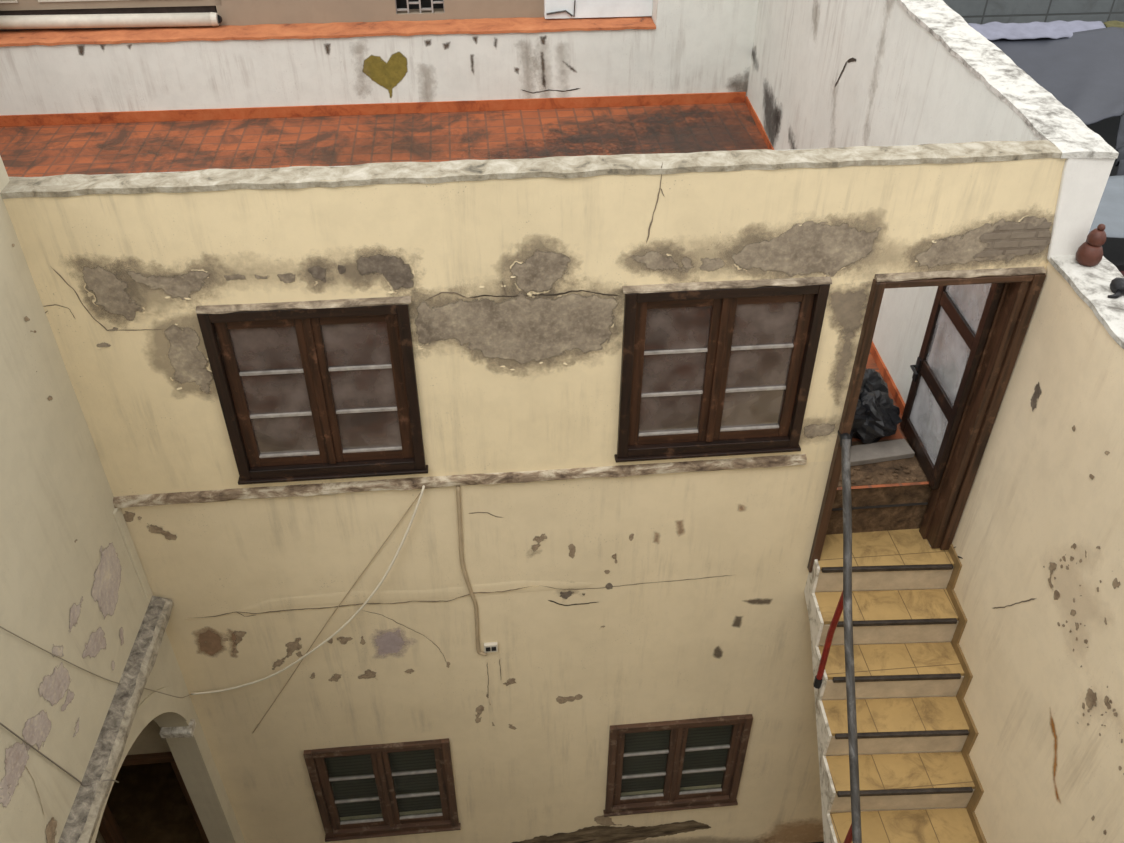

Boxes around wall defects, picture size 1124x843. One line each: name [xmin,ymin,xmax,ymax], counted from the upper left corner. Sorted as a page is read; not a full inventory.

crack [646,162,665,243]
flaking render [83,266,209,347]
flaking render [308,254,415,294]
flaking render [415,250,618,370]
flaking render [630,219,881,277]
flaking render [915,215,1052,268]
flaking render [164,324,213,394]
flaking render [1031,382,1044,411]
peeling [1043,543,1100,651]
peeling [1078,686,1117,736]
rust [1051,718,1059,800]
flaking render [512,815,711,843]